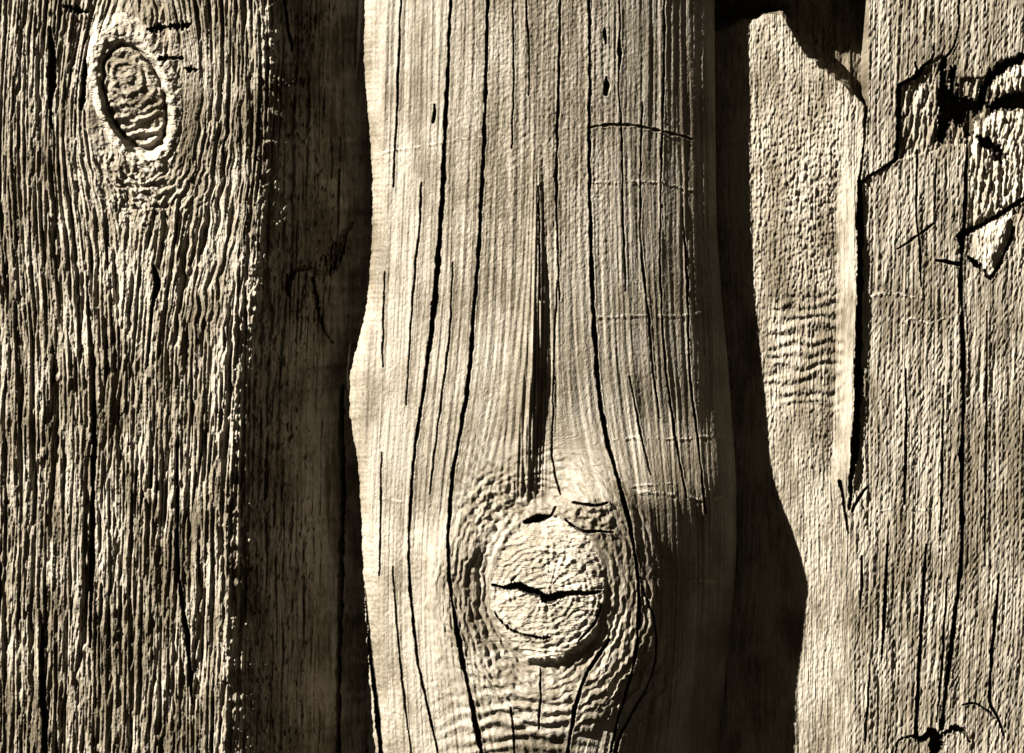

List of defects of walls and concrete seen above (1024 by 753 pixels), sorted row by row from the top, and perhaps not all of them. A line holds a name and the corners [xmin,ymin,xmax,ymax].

crack [335,0,531,753]
crack [491,0,707,753]
crack [838,0,1024,744]